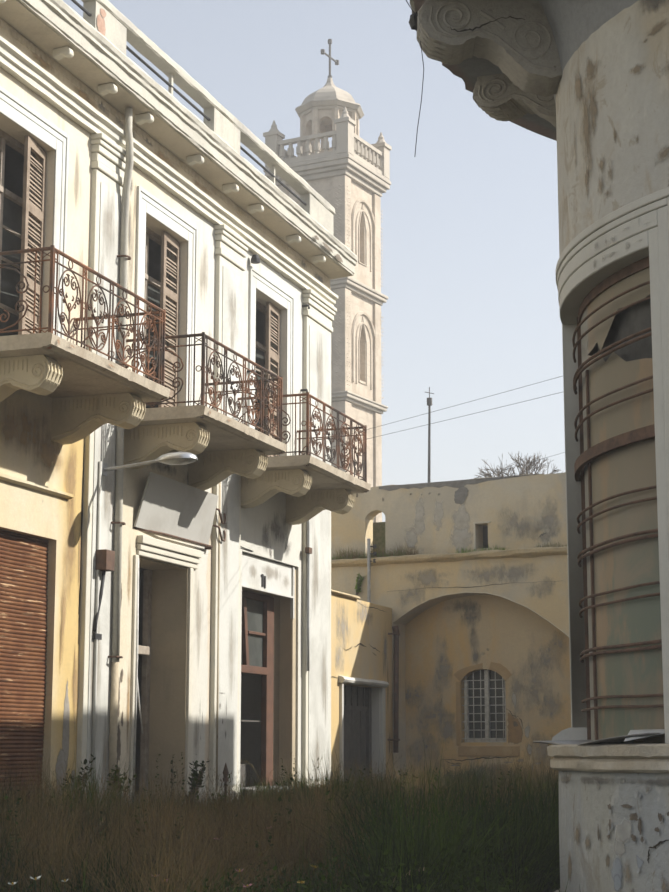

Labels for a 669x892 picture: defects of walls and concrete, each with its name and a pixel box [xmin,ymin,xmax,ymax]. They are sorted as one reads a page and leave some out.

crack [451,16,525,32]
water stain [574,61,612,195]
crack [358,583,508,612]
peeling [56,681,75,796]
peeling [597,804,645,843]
crack [647,840,669,863]